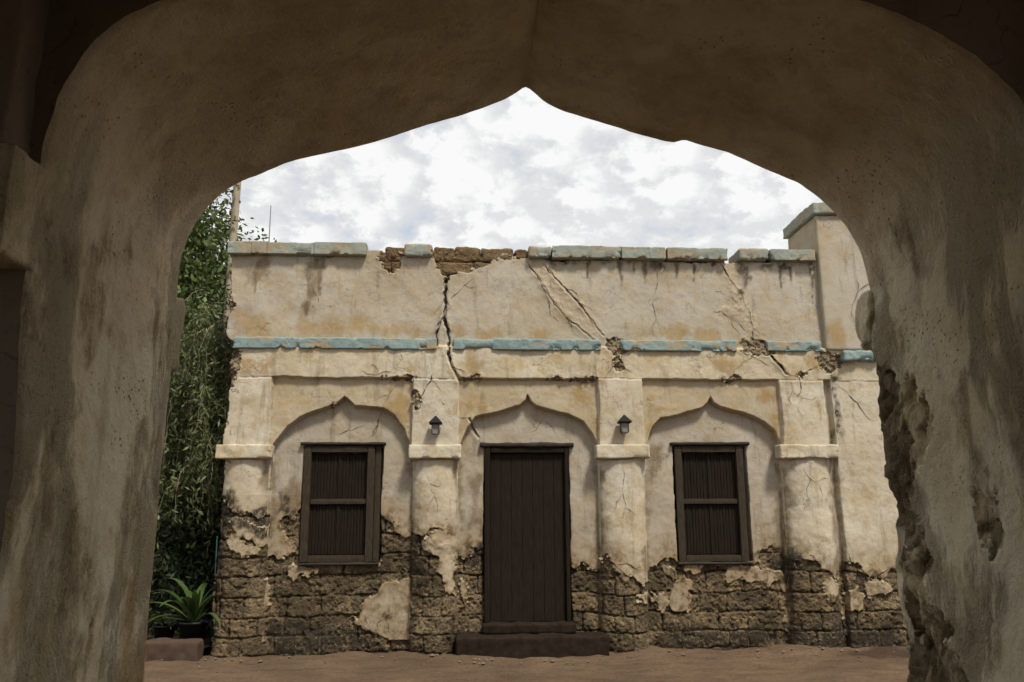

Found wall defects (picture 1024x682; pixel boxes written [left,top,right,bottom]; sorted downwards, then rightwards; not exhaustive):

spalling [376,247,405,275]
spalling [432,247,528,284]
crack [528,263,600,338]
crack [341,283,476,436]
spalling [605,337,628,372]
spalling [739,337,777,358]
crack [716,266,819,412]
spalling [795,349,844,379]
spalling [570,357,969,682]
spalling [970,485,1006,561]
spalling [210,495,484,658]